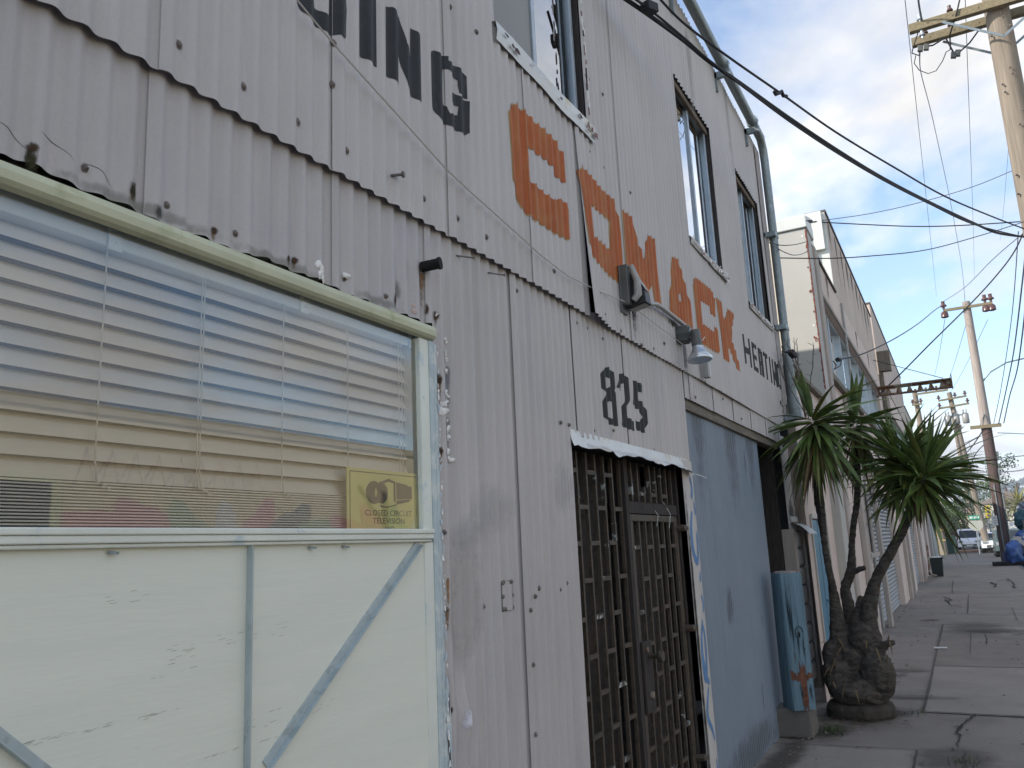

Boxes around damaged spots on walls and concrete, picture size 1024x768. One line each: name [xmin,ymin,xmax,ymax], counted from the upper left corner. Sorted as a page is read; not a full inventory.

peeling [437,337,455,561]